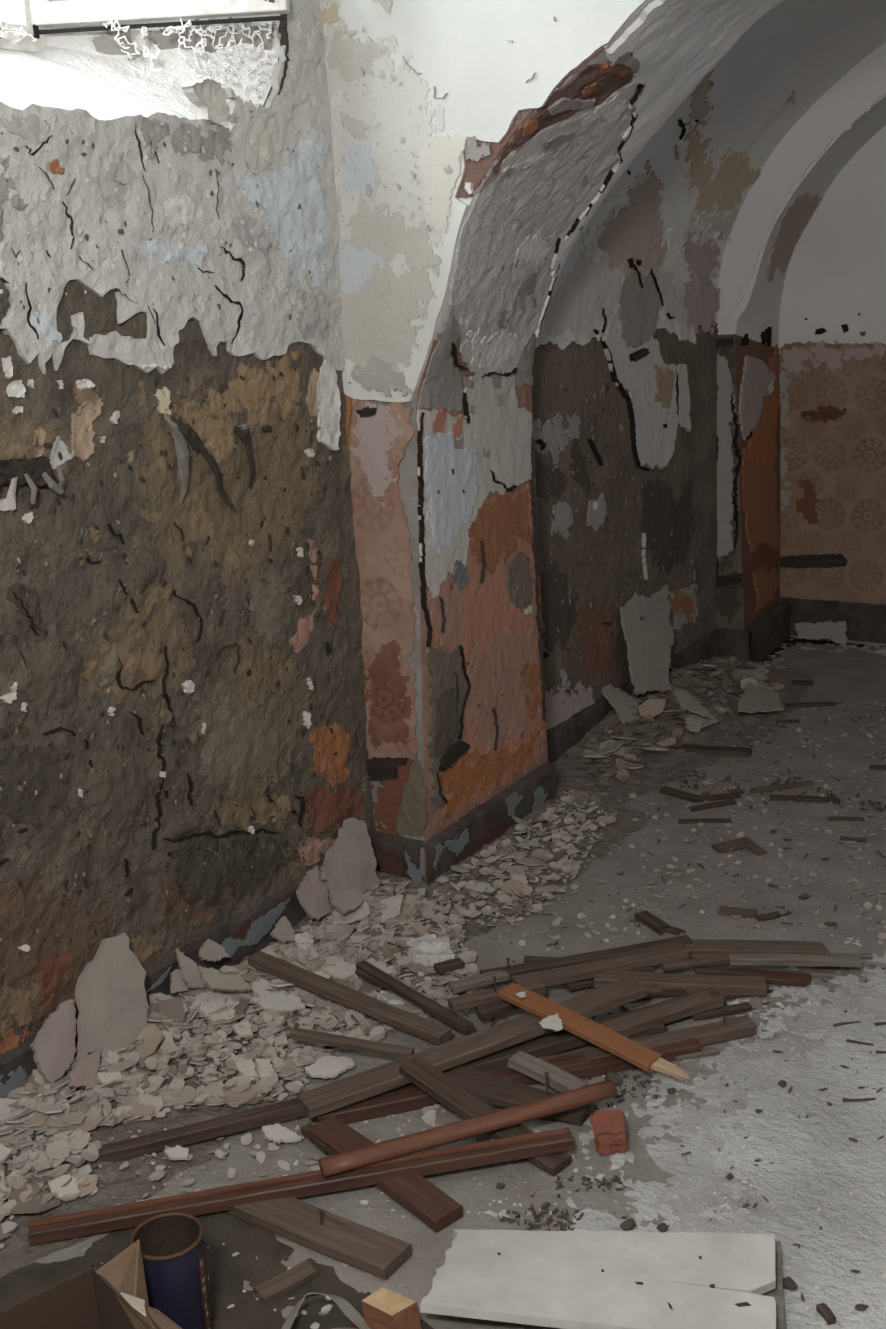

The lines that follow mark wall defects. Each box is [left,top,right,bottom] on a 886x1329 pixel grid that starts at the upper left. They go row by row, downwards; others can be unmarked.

peeling [91,33,164,68]
spalling [0,114,51,145]
spalling [139,78,234,166]
spalling [0,155,28,211]
spalling [49,159,66,175]
spalling [0,259,11,325]
spalling [56,279,172,369]
peeling [2,356,26,398]
peeling [48,379,104,470]